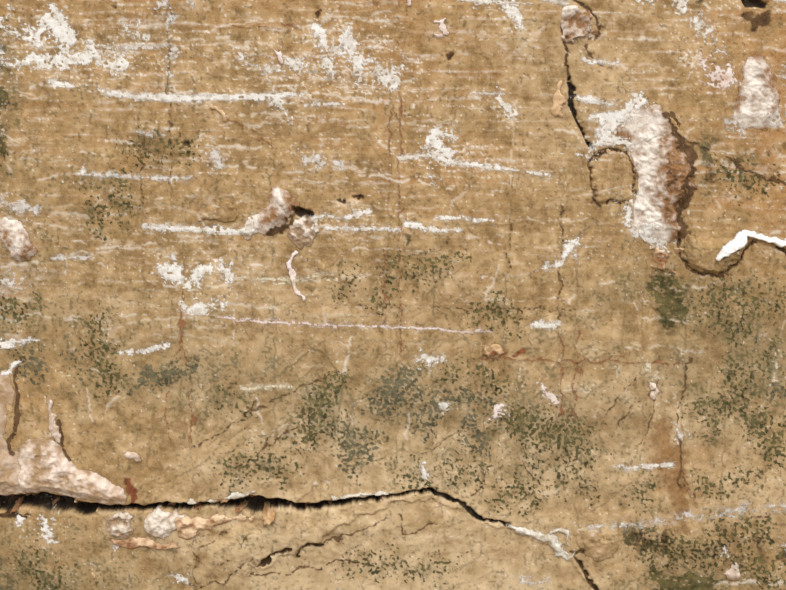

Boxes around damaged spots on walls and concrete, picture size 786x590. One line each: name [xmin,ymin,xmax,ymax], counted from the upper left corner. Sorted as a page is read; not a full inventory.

crack [561,0,637,207]
crack [726,156,786,185]
crack [677,240,756,278]
flaking render [48,400,62,443]
corrosion [124,478,137,503]
crack [0,465,511,526]
corrosion [654,424,689,517]
crack [169,514,437,588]
crack [570,550,599,590]
damp [623,525,671,546]
damp [644,560,723,590]